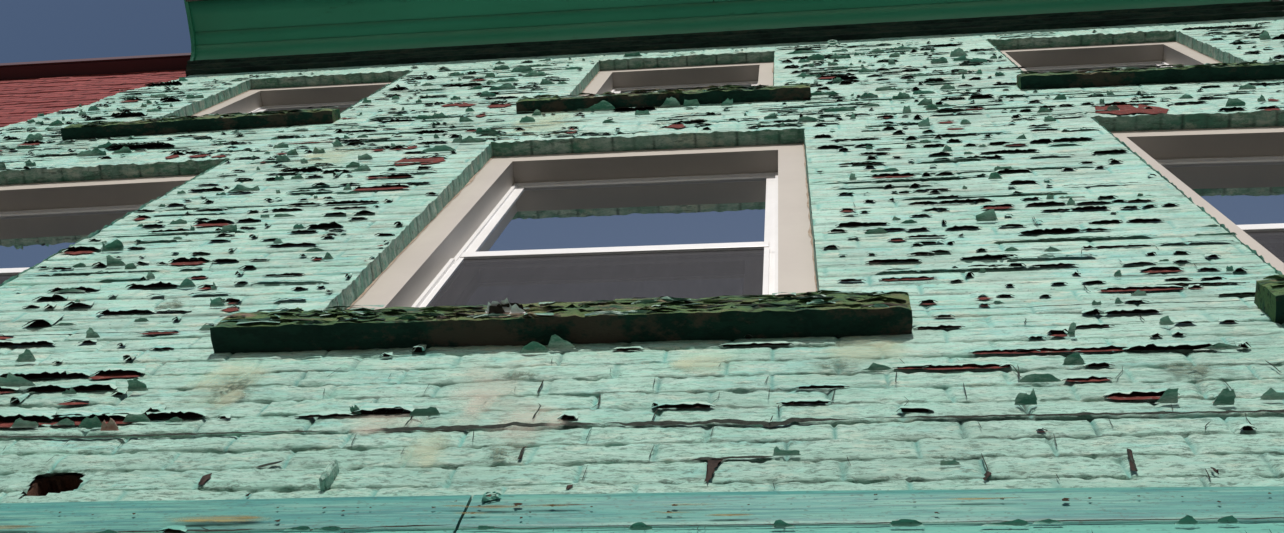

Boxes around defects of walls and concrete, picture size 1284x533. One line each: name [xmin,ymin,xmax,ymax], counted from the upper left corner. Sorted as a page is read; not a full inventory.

peeling [0,22,1284,431]
spalling [23,475,83,497]
peeling [1174,515,1200,525]
peeling [1218,515,1239,523]